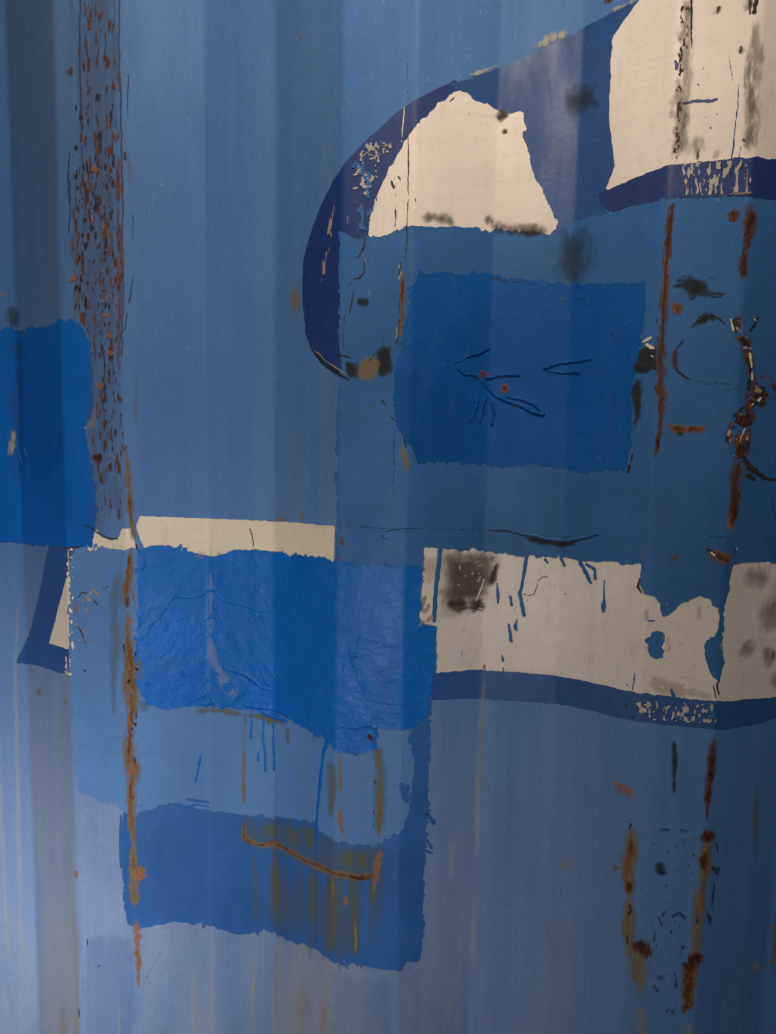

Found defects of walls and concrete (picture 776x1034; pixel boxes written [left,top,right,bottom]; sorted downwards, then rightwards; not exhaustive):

peeling [670,57,751,195]
peeling [343,141,392,346]
corrosion [728,208,757,278]
peeling [347,327,398,380]
corrosion [654,203,705,456]
corrosion [67,2,147,905]
peeling [625,663,720,723]
corrosion [330,760,343,836]
corrosion [133,920,142,986]
corrosion [242,823,382,950]
corrosion [614,823,652,990]
corrosion [681,740,720,1014]